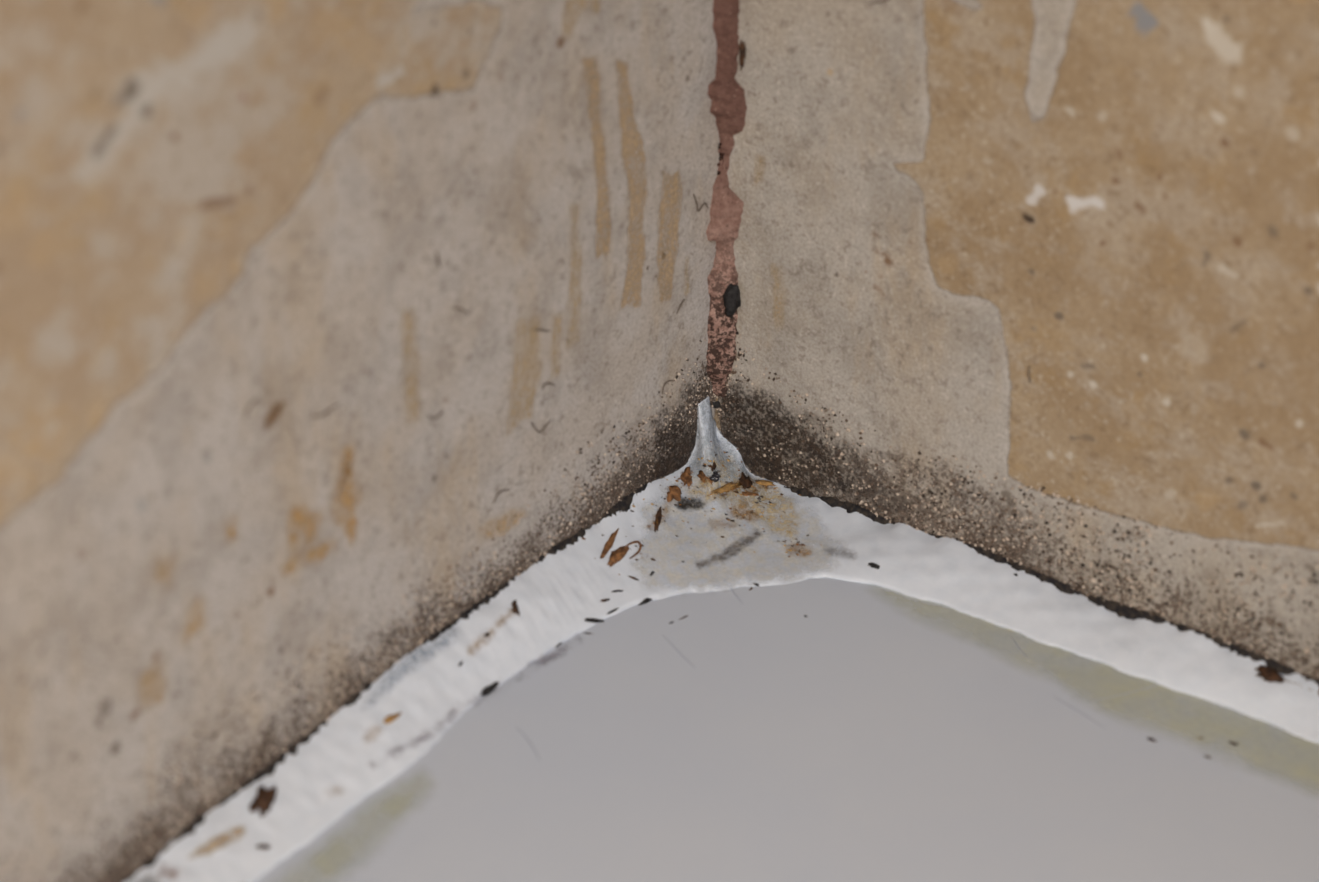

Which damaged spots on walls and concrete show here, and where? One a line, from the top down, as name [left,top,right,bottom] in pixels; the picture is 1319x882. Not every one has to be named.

peeling [0,0,720,882]
leakage [584,58,611,257]
leakage [617,61,689,307]
leakage [0,315,1319,882]
peeling [709,0,1319,678]